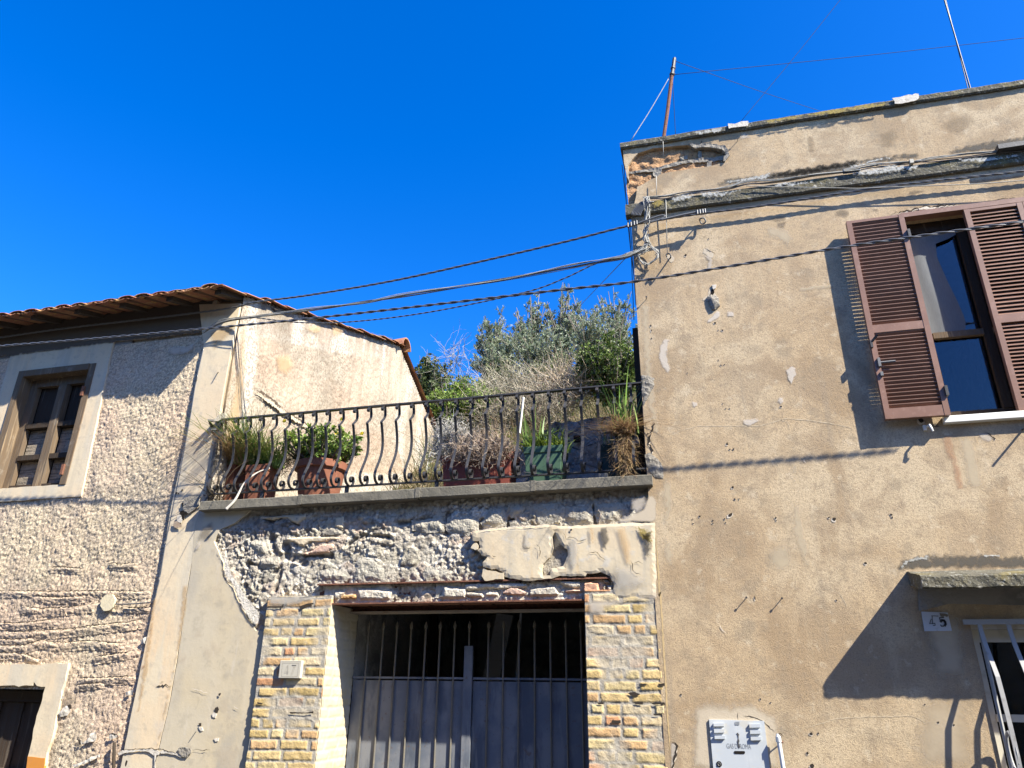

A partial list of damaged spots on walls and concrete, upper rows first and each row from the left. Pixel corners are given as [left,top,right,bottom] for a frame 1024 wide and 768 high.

flaking render [626,143,730,204]
flaking render [703,285,720,310]
flaking render [216,489,657,631]